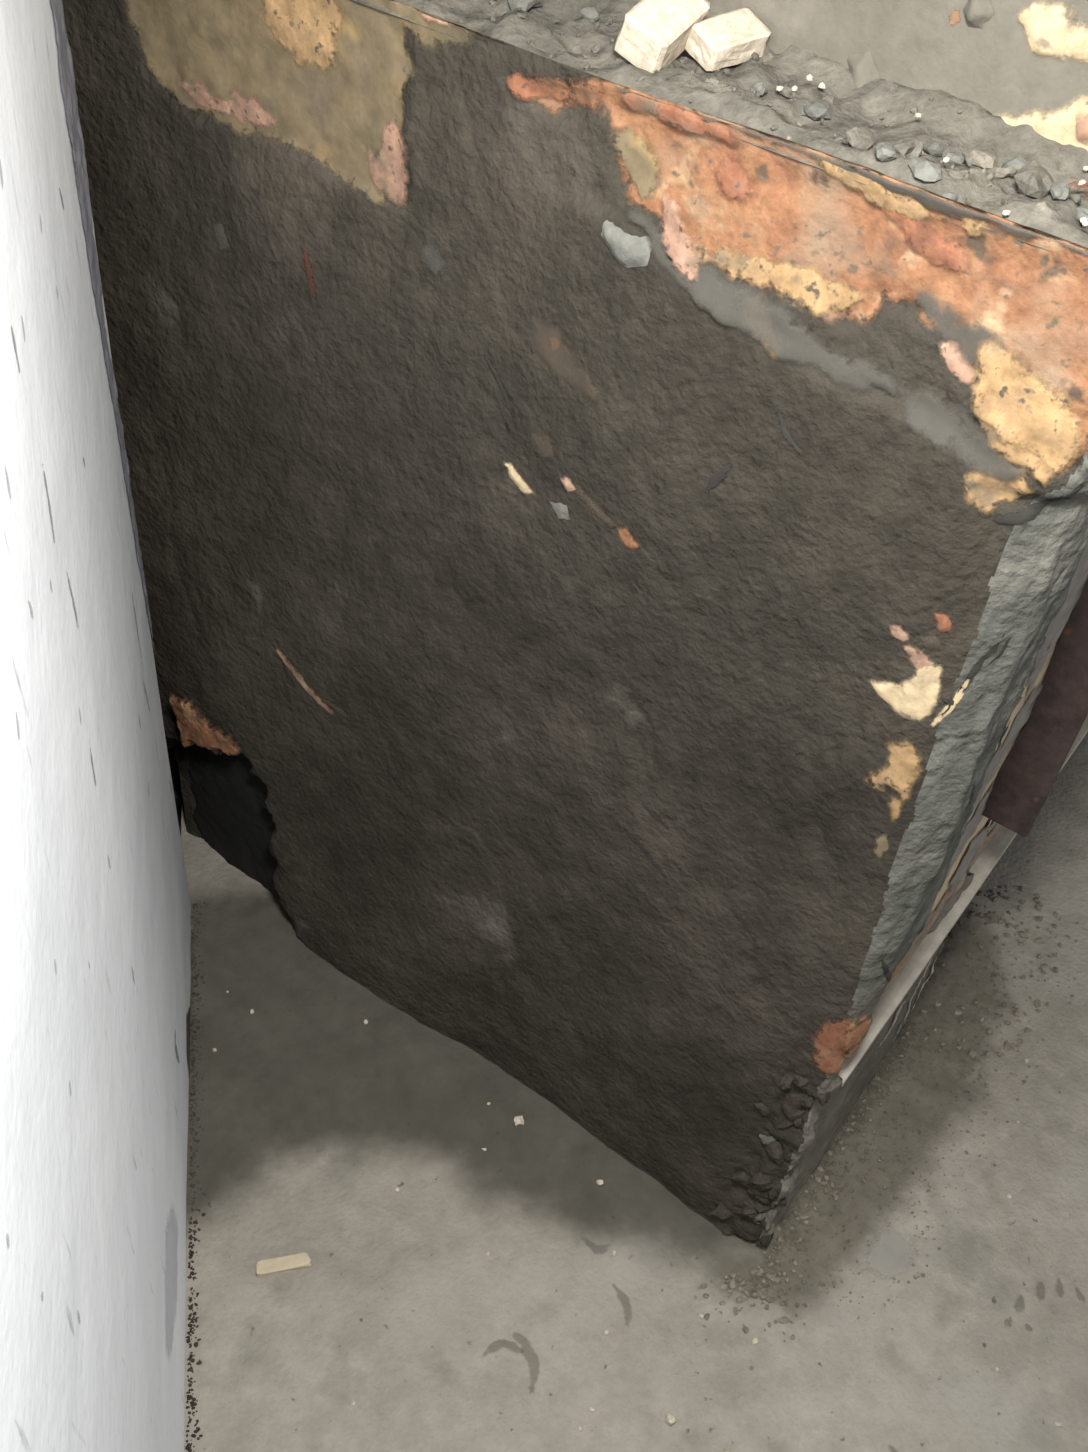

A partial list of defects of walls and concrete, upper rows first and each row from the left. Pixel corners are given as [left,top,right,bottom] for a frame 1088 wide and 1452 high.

flaking render [1018,3,1088,63]
flaking render [126,0,504,204]
spalling [507,74,1088,513]
spalling [871,613,952,721]
spalling [872,741,920,858]